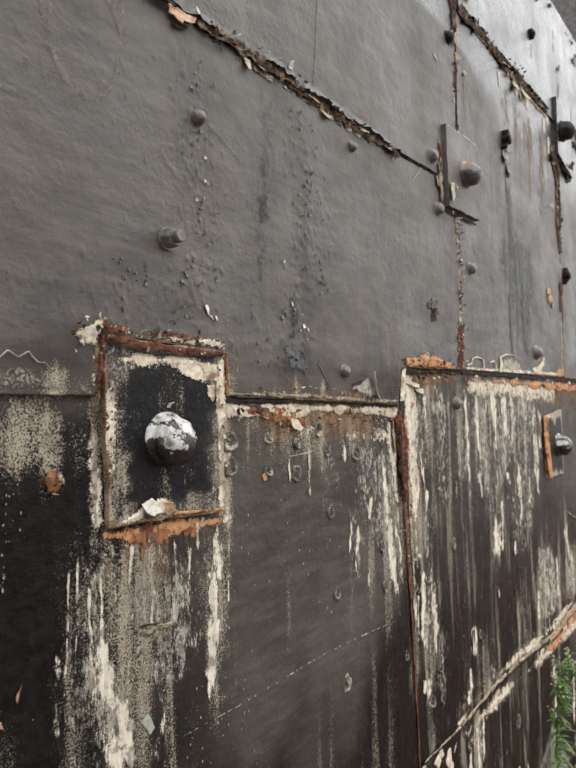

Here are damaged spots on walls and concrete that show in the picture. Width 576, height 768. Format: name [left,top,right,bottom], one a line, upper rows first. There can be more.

peeling [168,3,401,159]
rust [95,319,576,499]
leakage [91,422,102,555]
leakage [54,521,233,768]
leakage [308,438,404,597]
peeling [423,742,460,768]
leakage [467,717,487,768]
leakage [410,380,555,701]
leakage [530,524,576,639]
leakage [540,655,576,768]